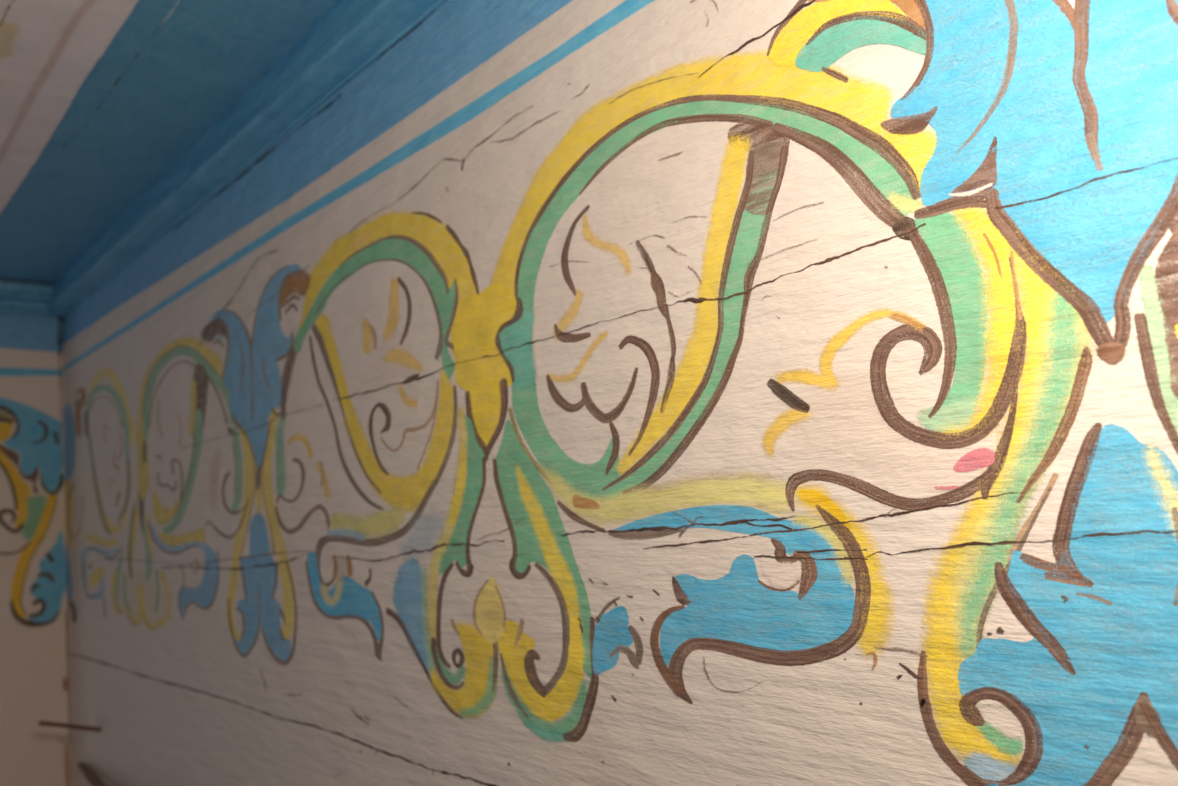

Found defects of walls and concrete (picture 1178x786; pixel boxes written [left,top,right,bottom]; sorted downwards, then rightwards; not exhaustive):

crack [995,158,1178,209]
crack [57,317,65,466]
crack [181,223,925,449]
crack [561,492,1178,560]
crack [65,609,497,786]